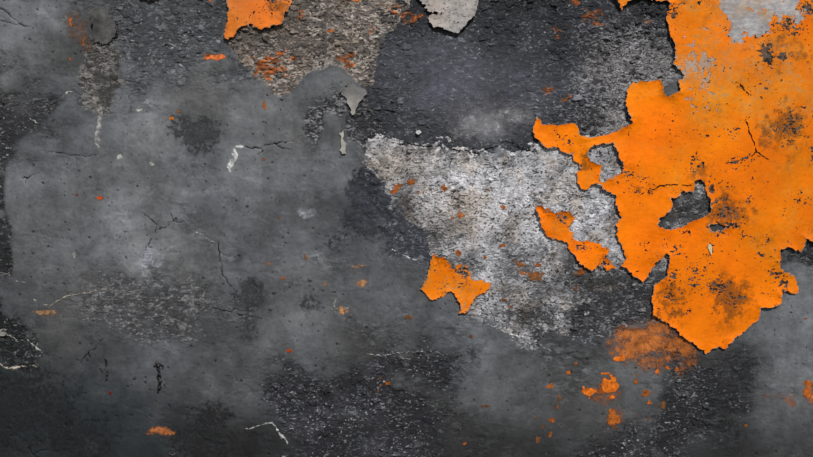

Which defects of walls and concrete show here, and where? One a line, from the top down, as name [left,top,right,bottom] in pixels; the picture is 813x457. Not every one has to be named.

flaking render [0,0,272,378]
crack [142,213,181,270]
peeling [216,0,813,457]